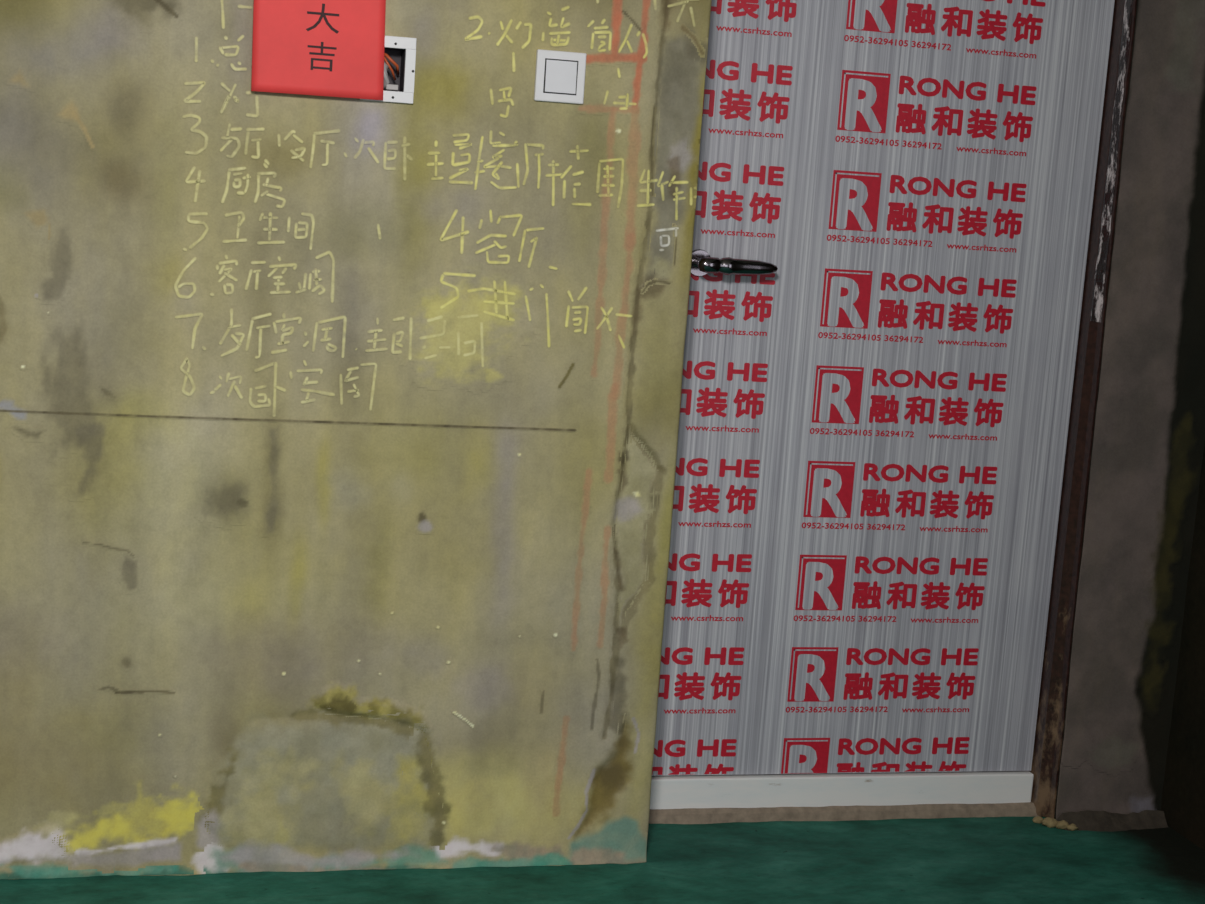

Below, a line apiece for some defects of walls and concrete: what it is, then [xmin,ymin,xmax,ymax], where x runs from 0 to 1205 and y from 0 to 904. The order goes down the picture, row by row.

crack [623,8,706,294]
crack [600,340,669,742]
damp [0,776,576,879]